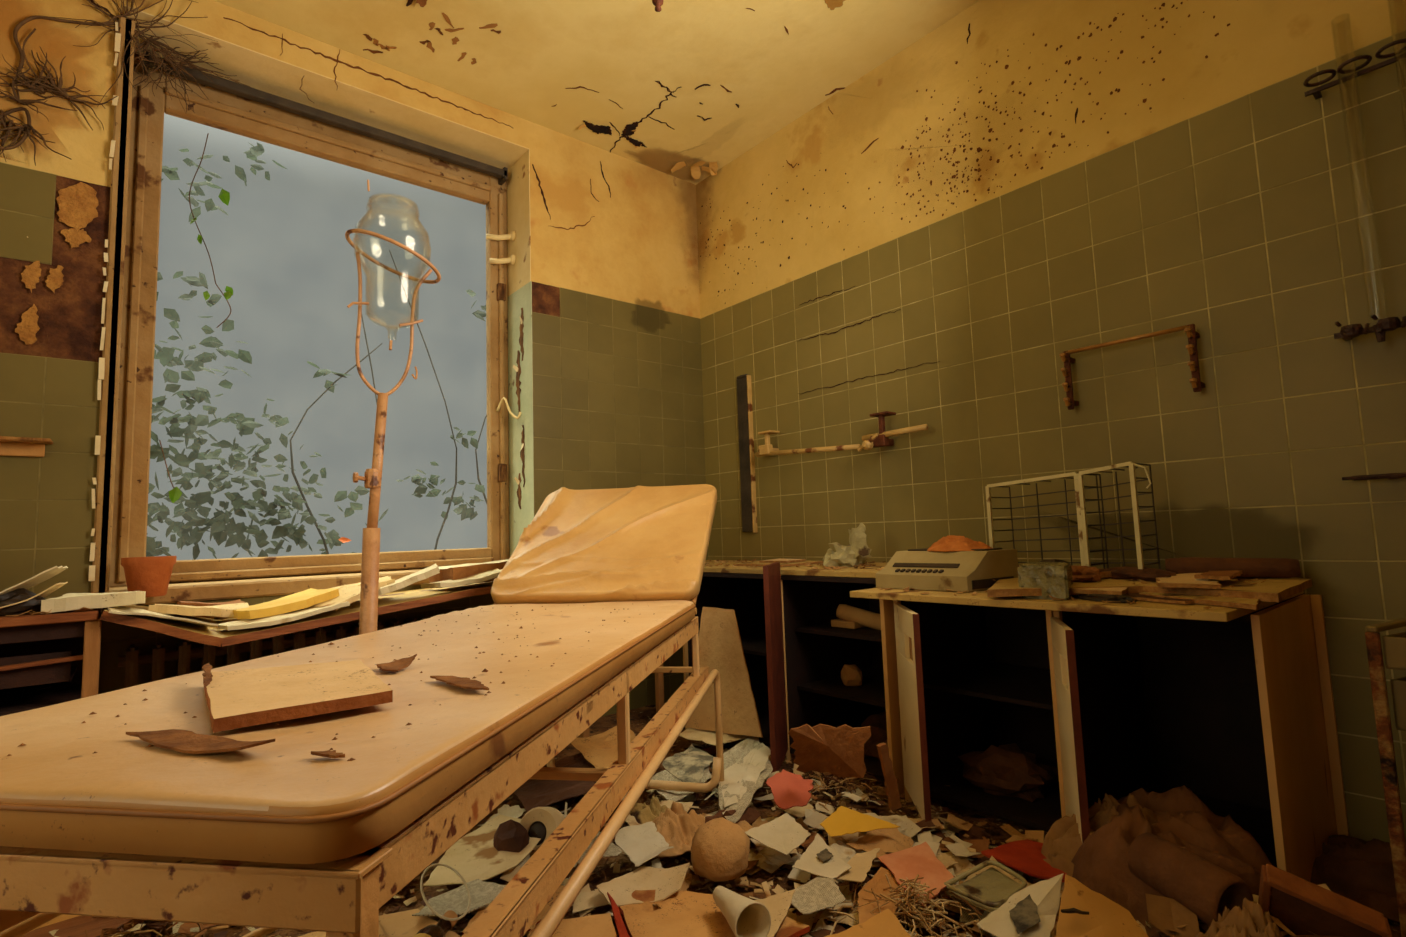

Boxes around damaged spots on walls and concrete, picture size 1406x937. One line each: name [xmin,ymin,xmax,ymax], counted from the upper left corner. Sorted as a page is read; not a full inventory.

peeling [363,34,396,54]
peeling [419,13,501,65]
crack [532,81,681,230]
peeling [825,0,845,10]
mould [864,2,1230,223]
peeling [0,140,116,400]
damp [700,164,846,304]